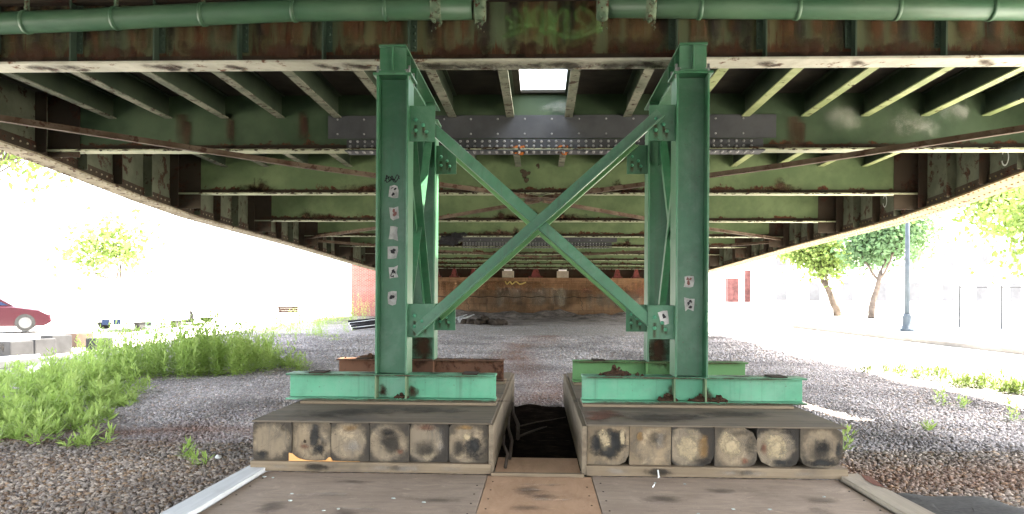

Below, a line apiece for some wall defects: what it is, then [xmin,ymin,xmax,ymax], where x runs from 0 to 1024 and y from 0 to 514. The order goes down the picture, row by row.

rust [1,32,88,72]
rust [84,29,146,61]
rust [152,25,231,71]
rust [255,20,402,70]
rust [423,2,490,67]
rust [506,1,668,69]
rust [691,19,753,57]
rust [780,20,844,56]
rust [870,20,934,56]
rust [958,21,1024,66]
rust [295,321,506,402]
rust [575,323,808,420]